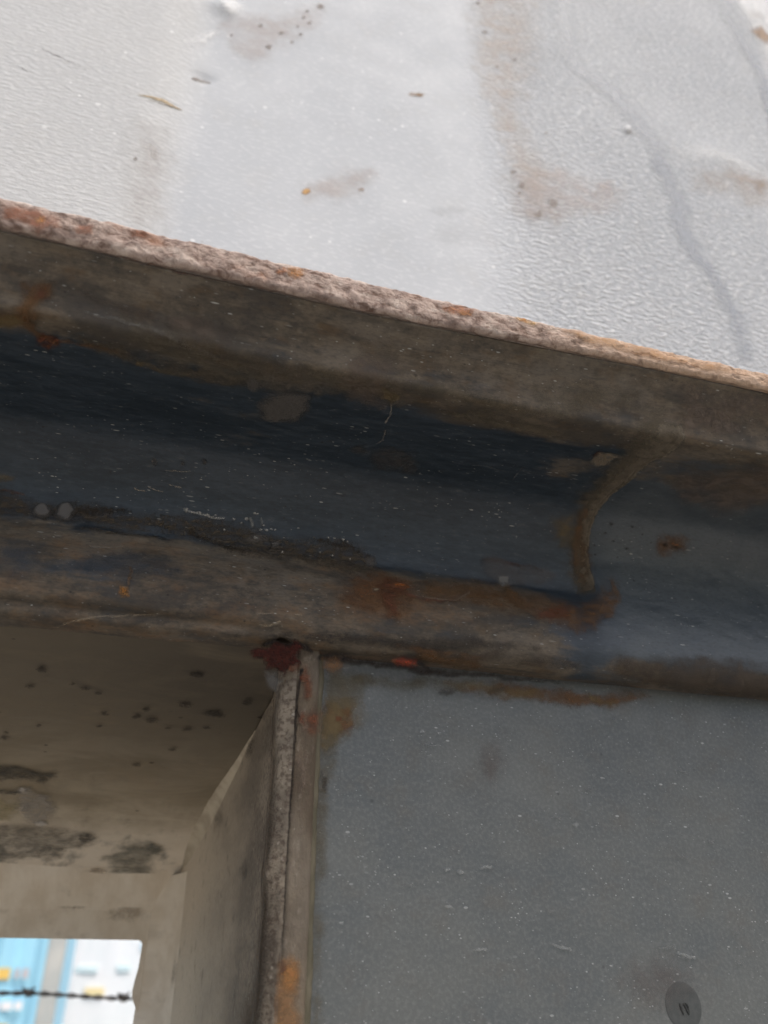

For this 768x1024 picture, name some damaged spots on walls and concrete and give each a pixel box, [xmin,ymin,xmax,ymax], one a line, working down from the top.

rust [4,207,57,233]
leakage [0,766,90,861]
leakage [108,844,161,873]